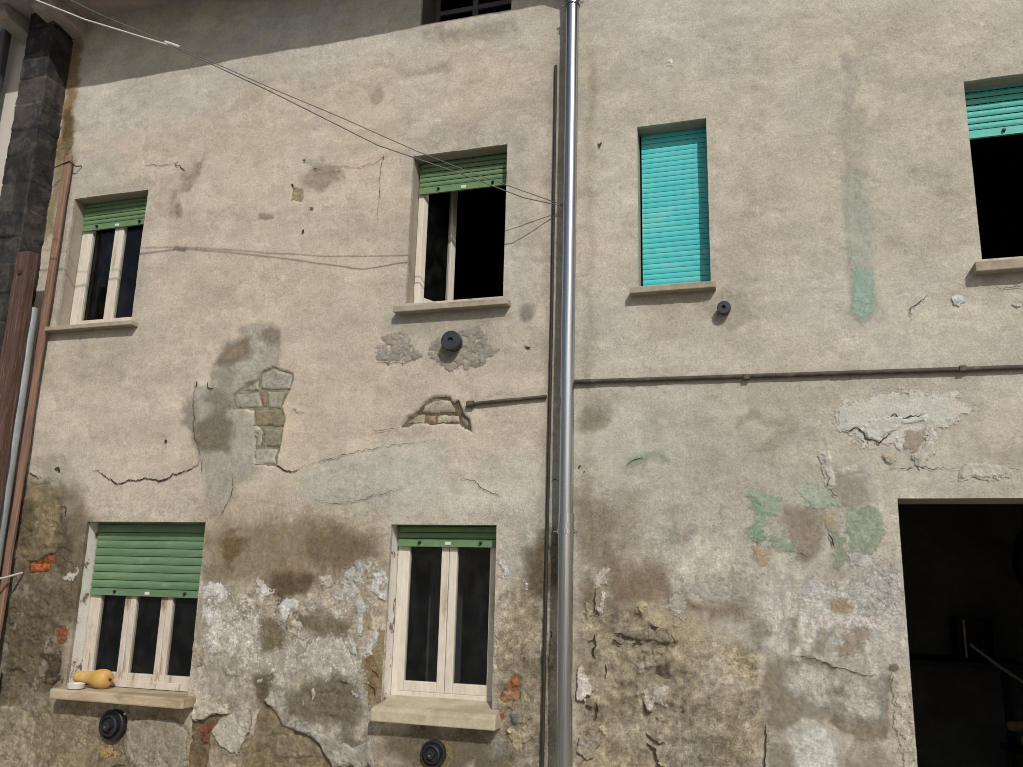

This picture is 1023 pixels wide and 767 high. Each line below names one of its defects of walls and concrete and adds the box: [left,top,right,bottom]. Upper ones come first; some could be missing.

corrosion [46,42,82,231]
crack [92,381,214,485]
spalling [233,368,294,466]
crack [277,441,425,473]
spalling [375,397,472,432]
peeling [831,386,976,469]
damp [15,472,71,567]
damp [195,519,375,727]
spalling [189,554,388,767]
peeling [576,664,594,701]
spalling [613,600,685,741]
peeling [886,663,917,767]